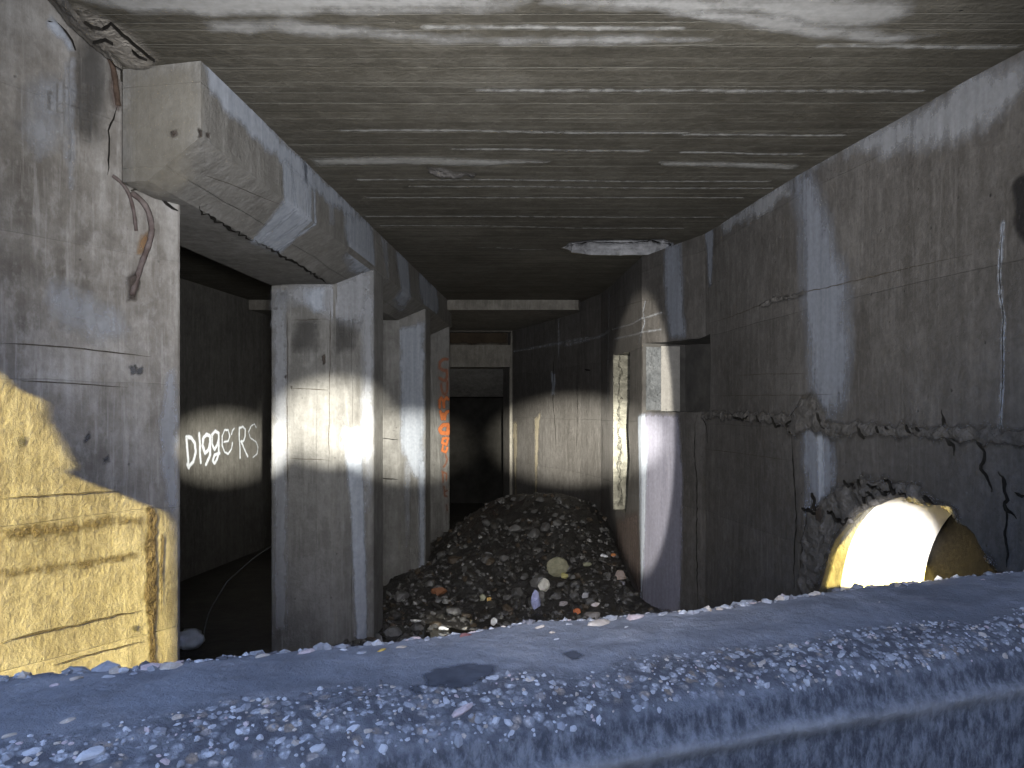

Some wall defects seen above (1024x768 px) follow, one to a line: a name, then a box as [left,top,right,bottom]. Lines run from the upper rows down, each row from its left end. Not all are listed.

spalling [48,0,155,70]
leakage [589,0,909,41]
spalling [563,238,673,255]
spalling [701,394,1024,448]
crack [941,410,1024,567]
spalling [796,475,959,595]